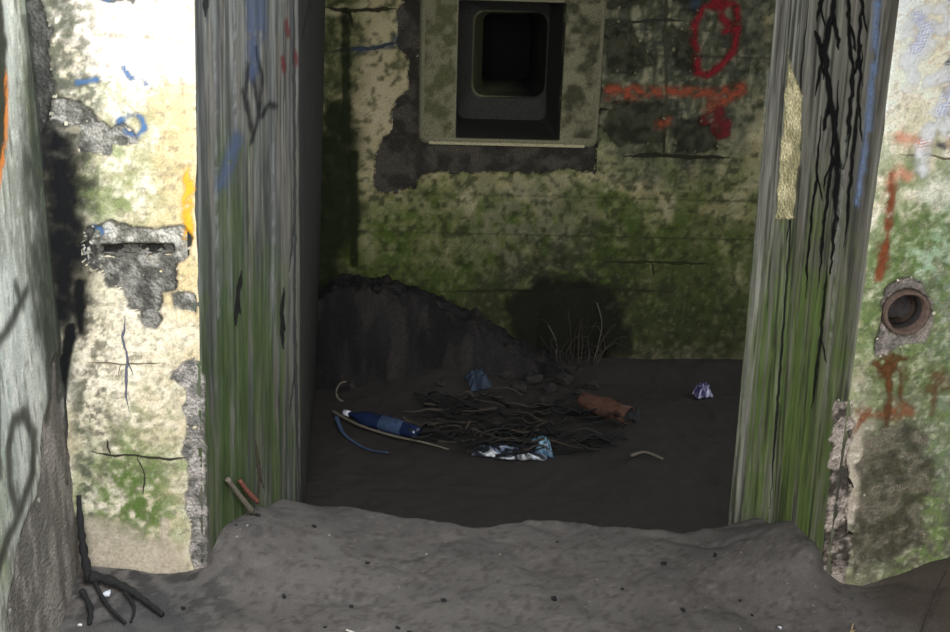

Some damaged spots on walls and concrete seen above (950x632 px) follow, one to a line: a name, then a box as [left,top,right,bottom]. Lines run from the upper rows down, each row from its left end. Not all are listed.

peeling [26,0,138,156]
spalling [373,0,718,194]
leakage [29,98,86,423]
spalling [82,220,196,329]
spalling [170,357,208,569]
crack [769,0,867,509]
peeling [822,399,935,584]
corrosion [856,353,914,430]
spalling [874,276,936,357]